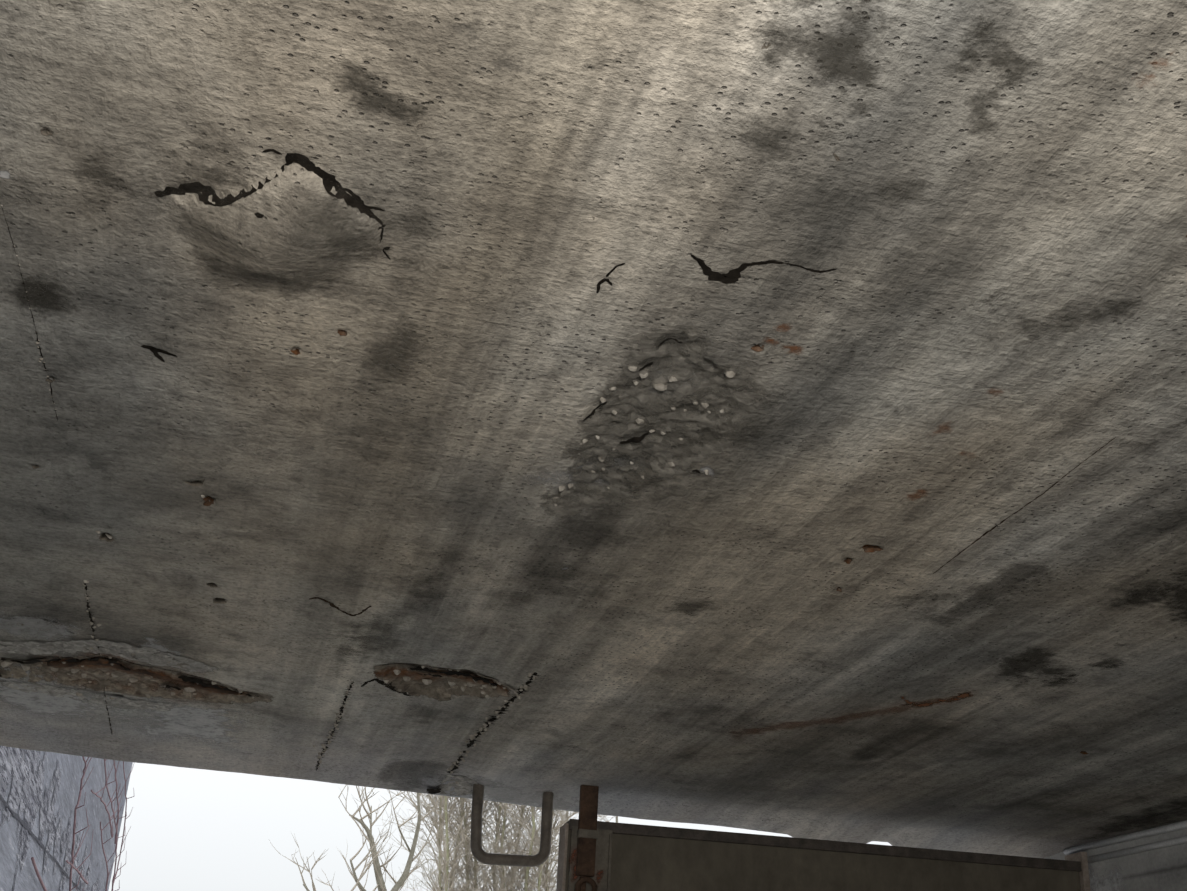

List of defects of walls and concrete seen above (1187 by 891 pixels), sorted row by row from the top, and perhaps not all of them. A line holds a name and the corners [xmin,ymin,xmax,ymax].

leakage [767,30,874,85]
leakage [959,28,1031,85]
crack [154,149,390,259]
crack [596,263,625,293]
crack [691,254,836,284]
crack [309,597,372,616]
leakage [1117,573,1187,621]
spalling [0,640,273,705]
spalling [374,663,515,701]
leakage [1001,648,1074,686]
crack [313,678,411,771]
crack [446,672,539,773]